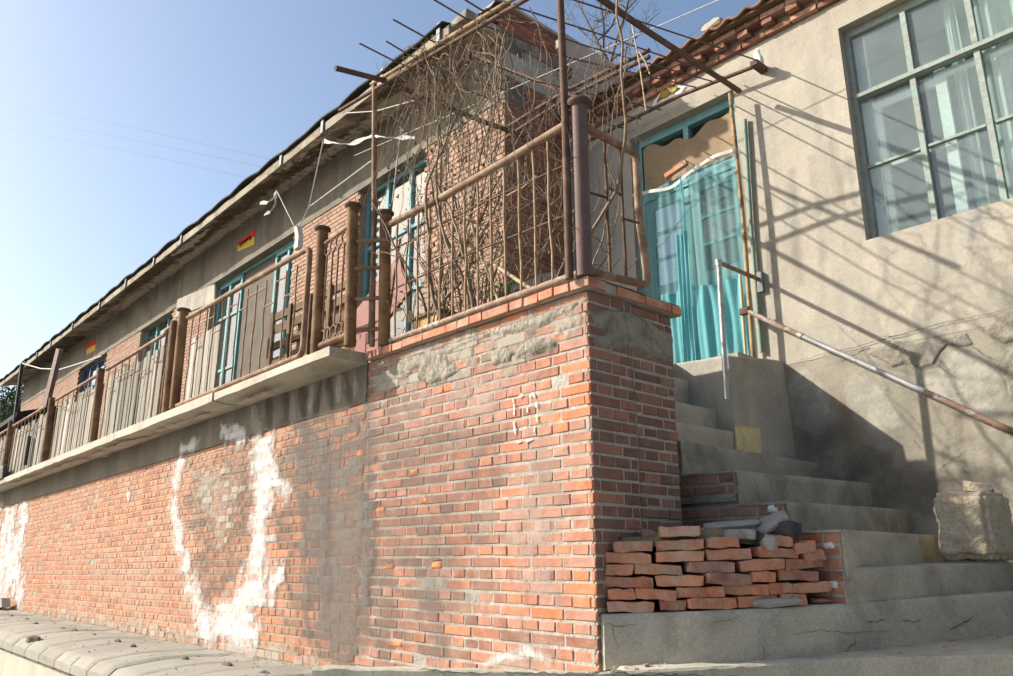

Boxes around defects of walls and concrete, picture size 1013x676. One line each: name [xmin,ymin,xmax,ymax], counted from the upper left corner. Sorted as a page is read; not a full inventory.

spalling [503,310,527,324]
flaking render [978,310,1013,357]
flaking render [786,367,834,430]
flaking render [846,374,899,434]
flaking render [867,333,1003,418]
damp [34,302,674,667]
damp [0,501,28,610]
crack [796,619,920,652]